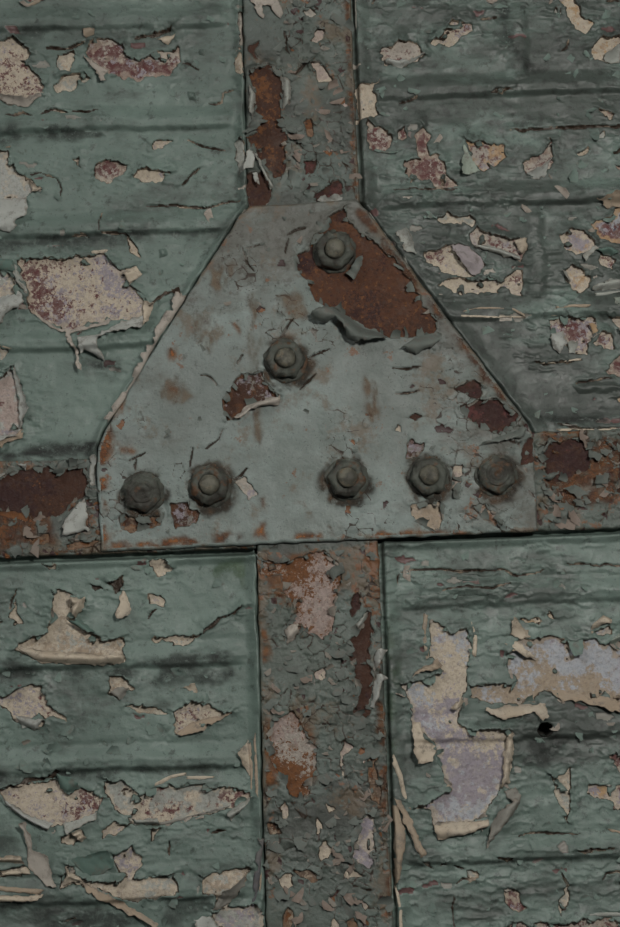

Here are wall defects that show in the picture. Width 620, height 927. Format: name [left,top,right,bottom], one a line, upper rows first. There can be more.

peeling [0,10,180,107]
corrosion [240,42,291,206]
peeling [273,0,472,202]
peeling [0,218,180,370]
corrosion [293,181,442,354]
peeling [396,208,528,302]
corrosion [0,430,134,555]
corrosion [456,337,620,504]
peeling [15,589,125,683]
corrosion [256,551,345,644]
corrosion [346,593,388,746]
peeling [194,608,620,927]